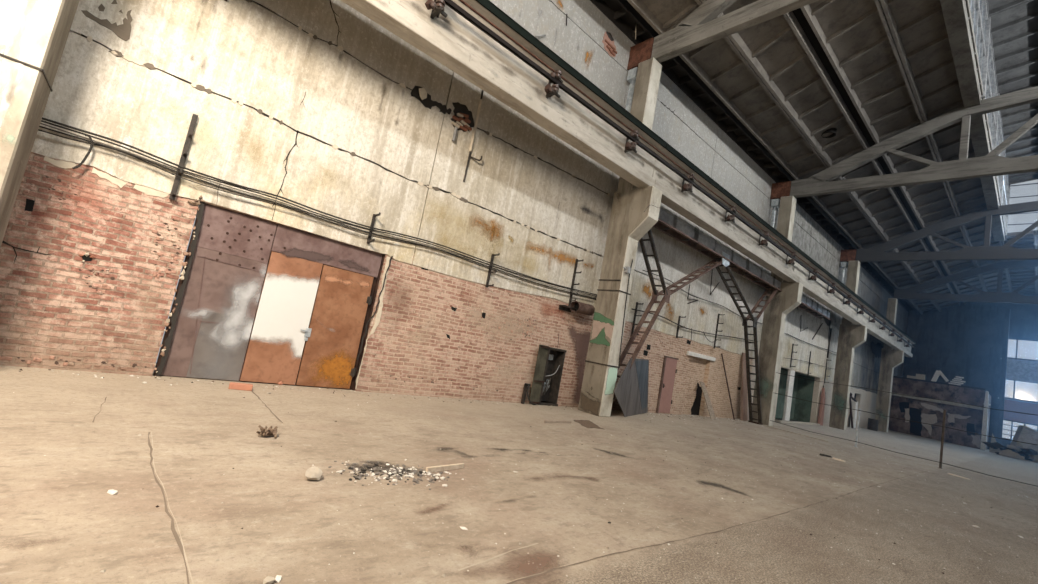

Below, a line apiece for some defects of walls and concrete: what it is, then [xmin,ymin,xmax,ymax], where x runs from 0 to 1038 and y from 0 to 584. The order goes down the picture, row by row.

peeling [81,0,156,69]
spalling [411,86,490,141]
spalling [24,183,35,212]
peeling [44,156,78,200]
peeling [92,167,169,198]
crack [272,130,299,219]
corrosion [474,219,512,242]
corrosion [529,246,593,268]